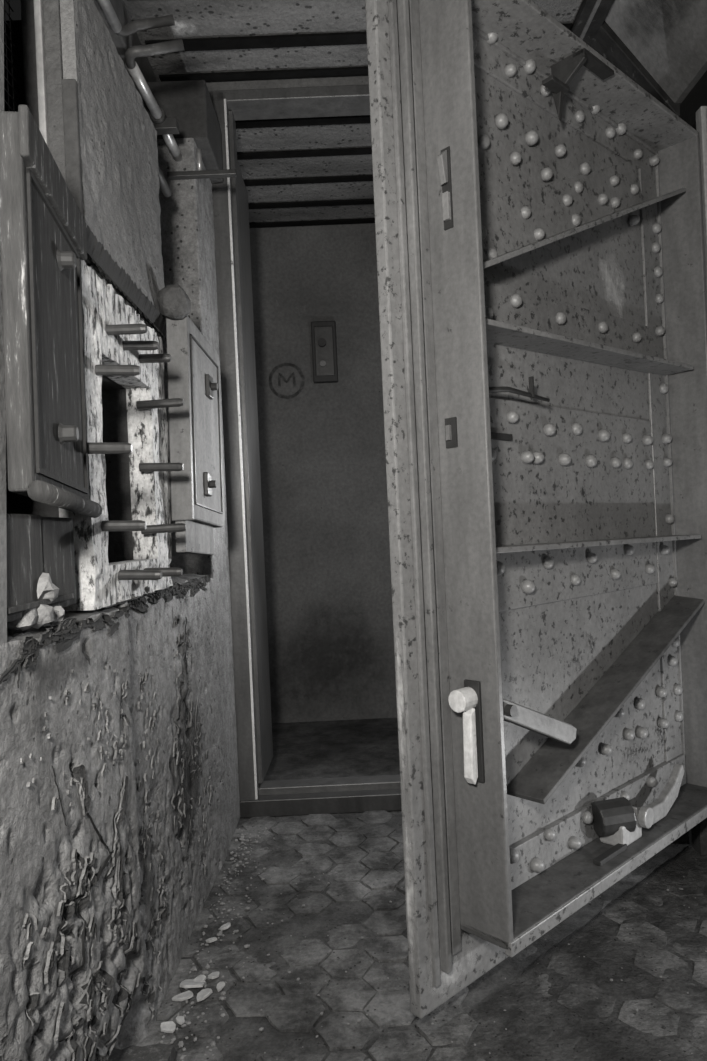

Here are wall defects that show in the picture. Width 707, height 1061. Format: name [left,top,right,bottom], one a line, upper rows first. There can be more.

spalling [19,575,210,668]
spalling [171,616,214,847]
spalling [22,669,225,1061]